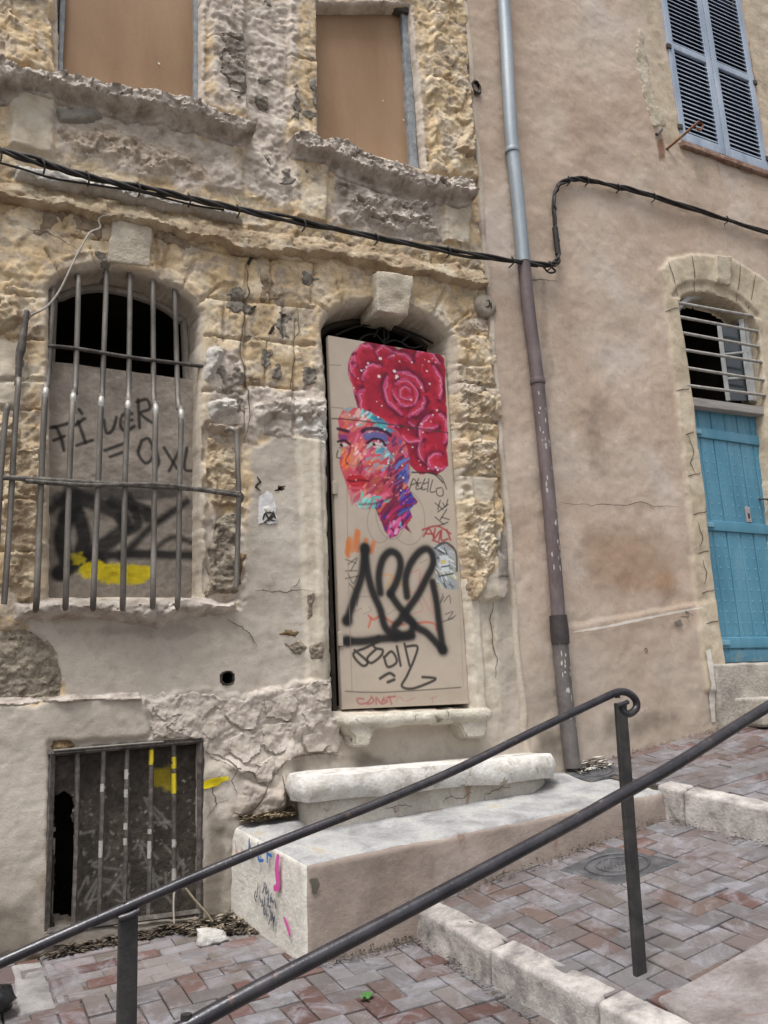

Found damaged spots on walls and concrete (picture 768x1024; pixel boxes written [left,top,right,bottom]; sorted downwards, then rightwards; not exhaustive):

spalling [204,437,247,597]
crack [563,501,714,594]
spalling [0,630,62,702]
crack [255,578,310,593]
spalling [279,630,325,659]
spalling [307,592,315,619]
crack [490,605,498,669]
crack [163,719,341,818]